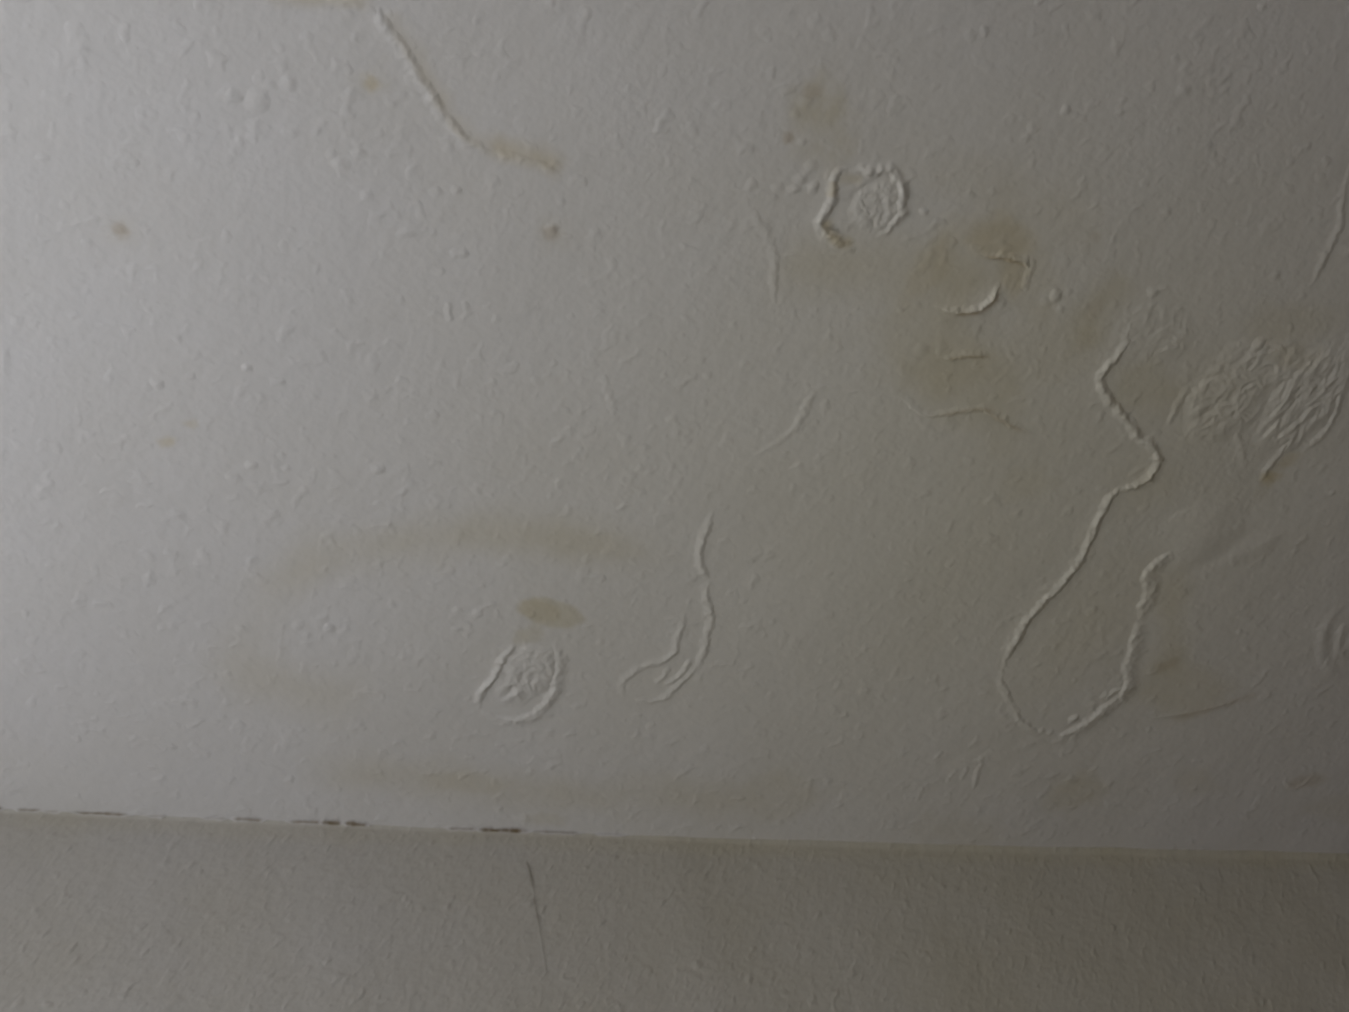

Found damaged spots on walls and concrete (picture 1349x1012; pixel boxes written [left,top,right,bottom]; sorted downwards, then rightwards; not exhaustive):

peeling [803,156,914,255]
peeling [932,281,1001,314]
peeling [613,506,717,705]
crack [0,806,369,827]